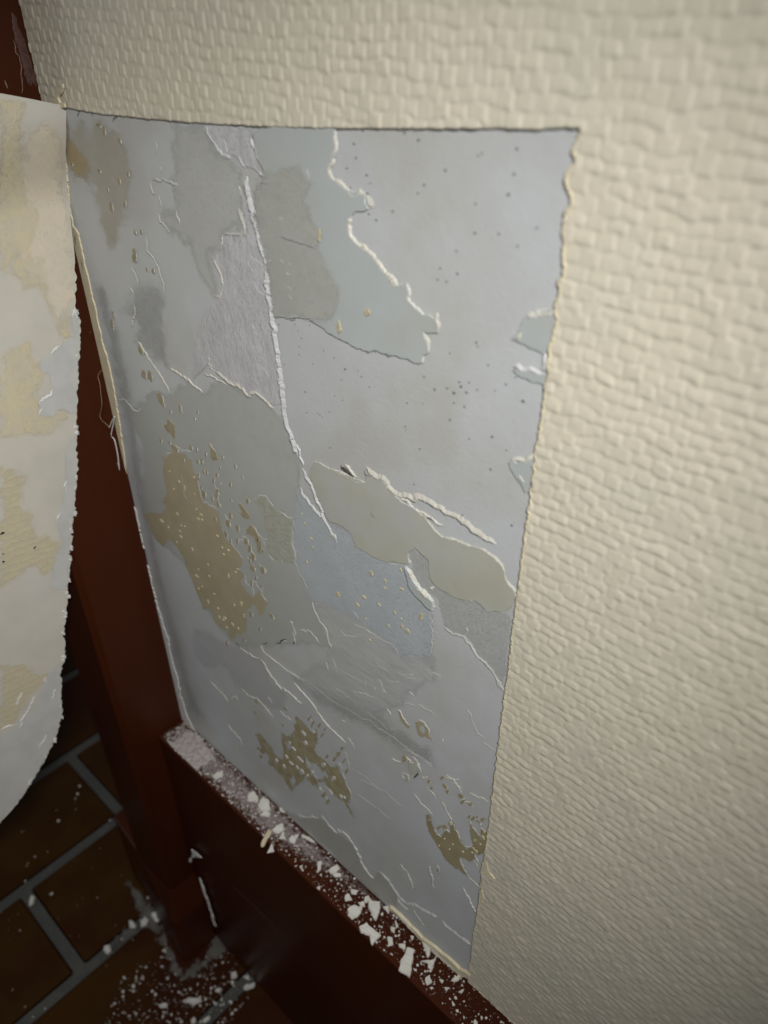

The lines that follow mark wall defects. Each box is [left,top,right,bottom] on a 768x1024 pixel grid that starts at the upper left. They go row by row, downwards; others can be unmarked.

peeling [0,93,579,1006]